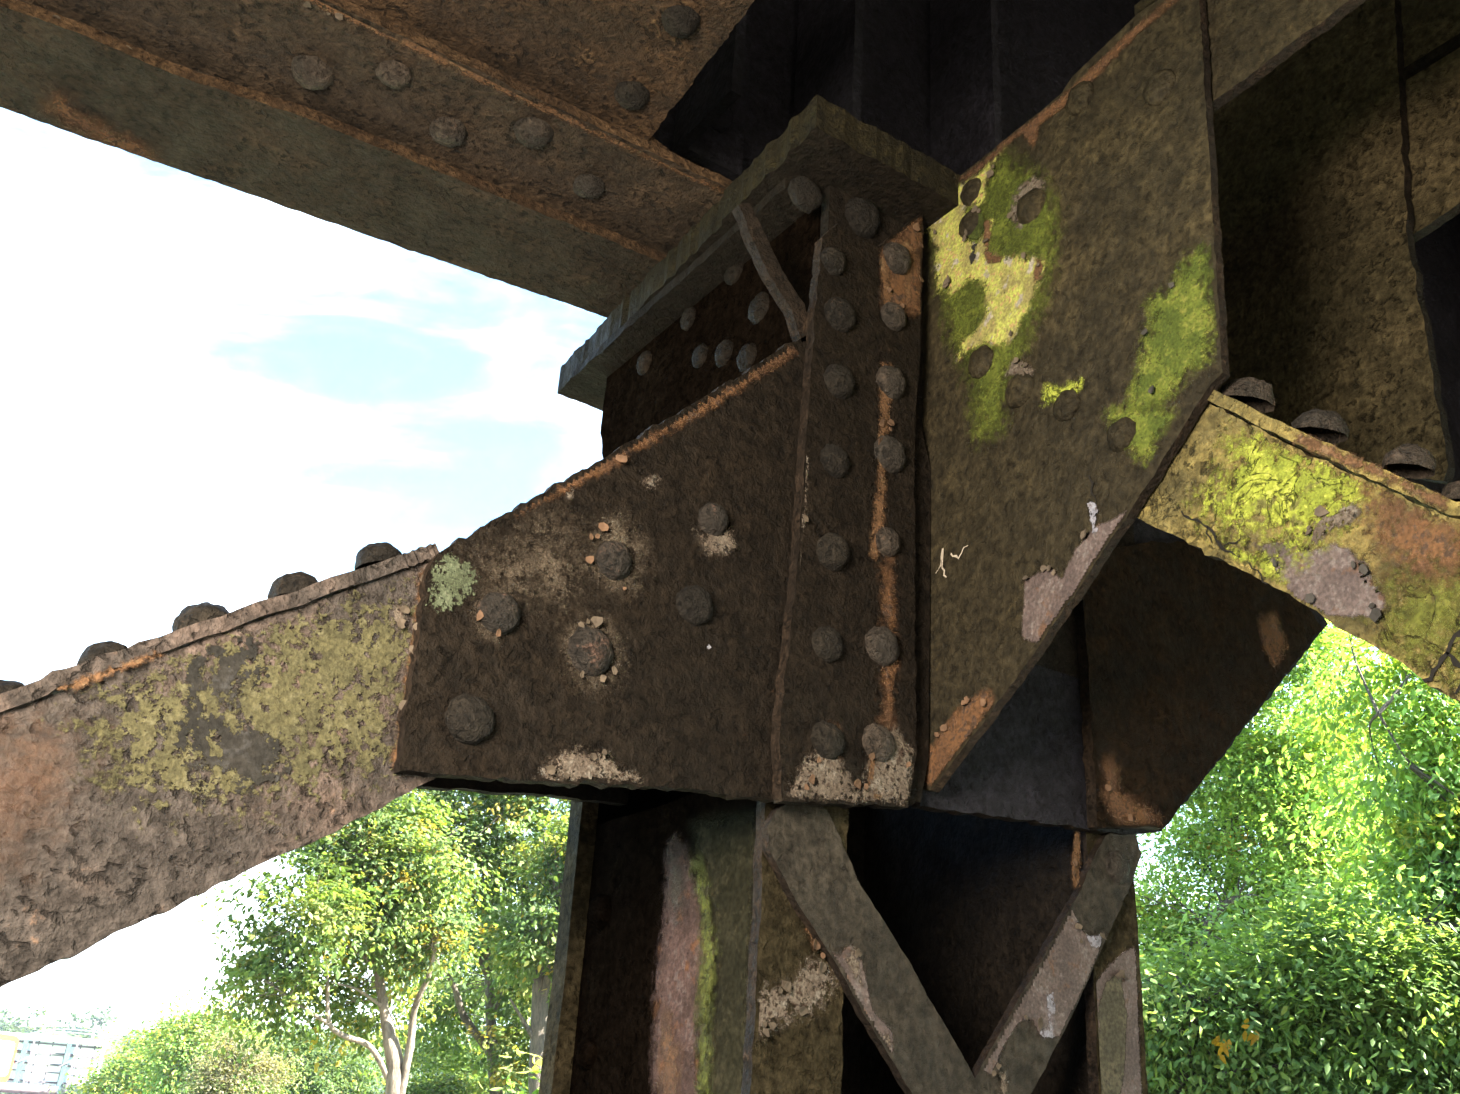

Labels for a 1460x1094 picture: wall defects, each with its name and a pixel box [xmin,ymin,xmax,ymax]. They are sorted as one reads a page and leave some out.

rust [880,218,924,315]
rust [869,388,895,630]
peeling [1022,502,1127,642]
crack [1422,630,1460,694]
rust [788,660,994,806]